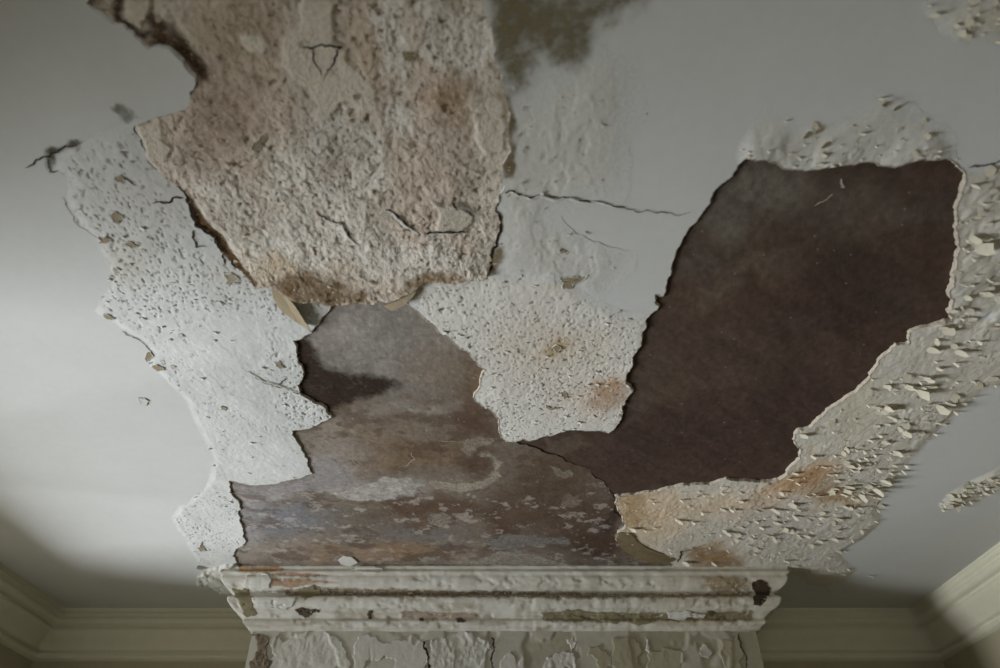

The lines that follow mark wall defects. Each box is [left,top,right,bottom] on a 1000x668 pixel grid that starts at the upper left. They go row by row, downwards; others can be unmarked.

water stain [493,0,629,83]
crack [300,44,342,81]
crack [26,141,97,238]
crack [317,214,360,247]
crack [385,190,680,275]
spalling [50,40,1000,593]
peeling [295,585,322,618]
peeling [561,609,651,626]
peeling [249,618,491,668]
peeling [500,651,525,668]
peeling [543,637,684,668]